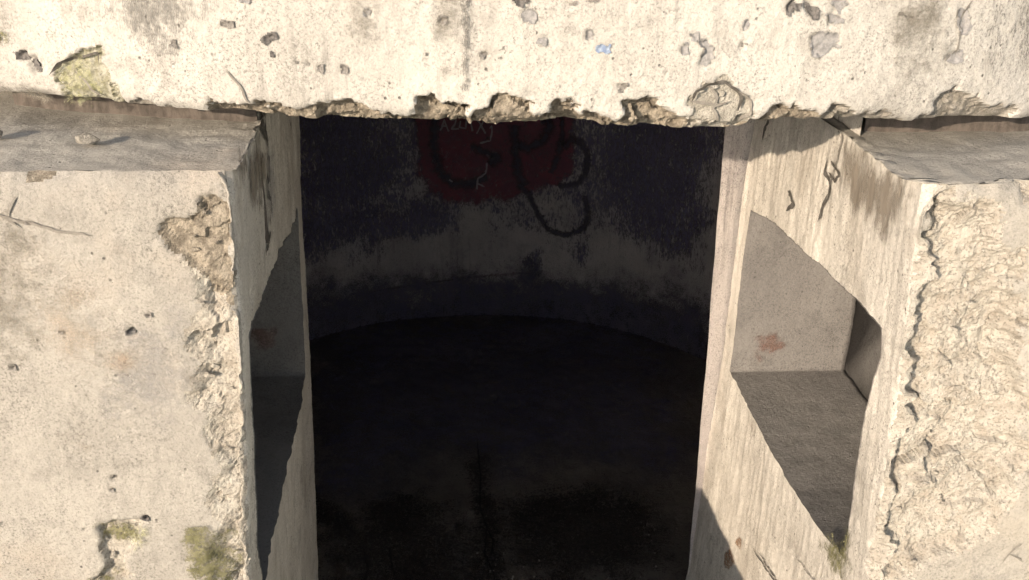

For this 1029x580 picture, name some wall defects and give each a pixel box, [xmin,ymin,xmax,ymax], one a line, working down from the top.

peeling [260,32,278,58]
peeling [585,29,611,54]
peeling [681,31,714,66]
spalling [15,45,173,107]
spalling [207,74,1019,128]
spalling [158,194,251,580]
spalling [866,180,1029,580]
water stain [311,338,700,580]
crack [751,546,776,580]